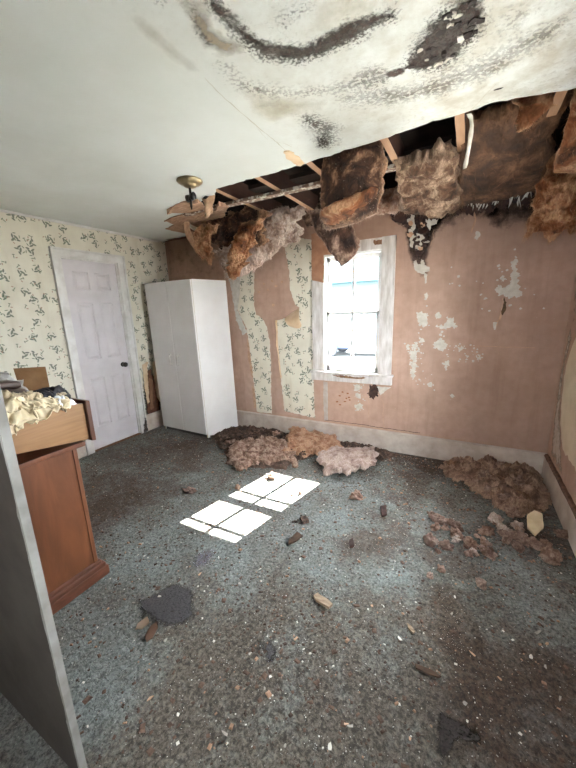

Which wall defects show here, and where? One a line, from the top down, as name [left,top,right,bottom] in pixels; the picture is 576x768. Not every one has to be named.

damp [195,0,395,64]
damp [354,0,485,102]
damp [481,27,555,72]
mould [303,116,334,148]
spalling [311,233,332,283]
peeling [391,211,438,283]
peeling [495,248,535,309]
peeling [404,293,484,391]
spalling [333,375,391,411]